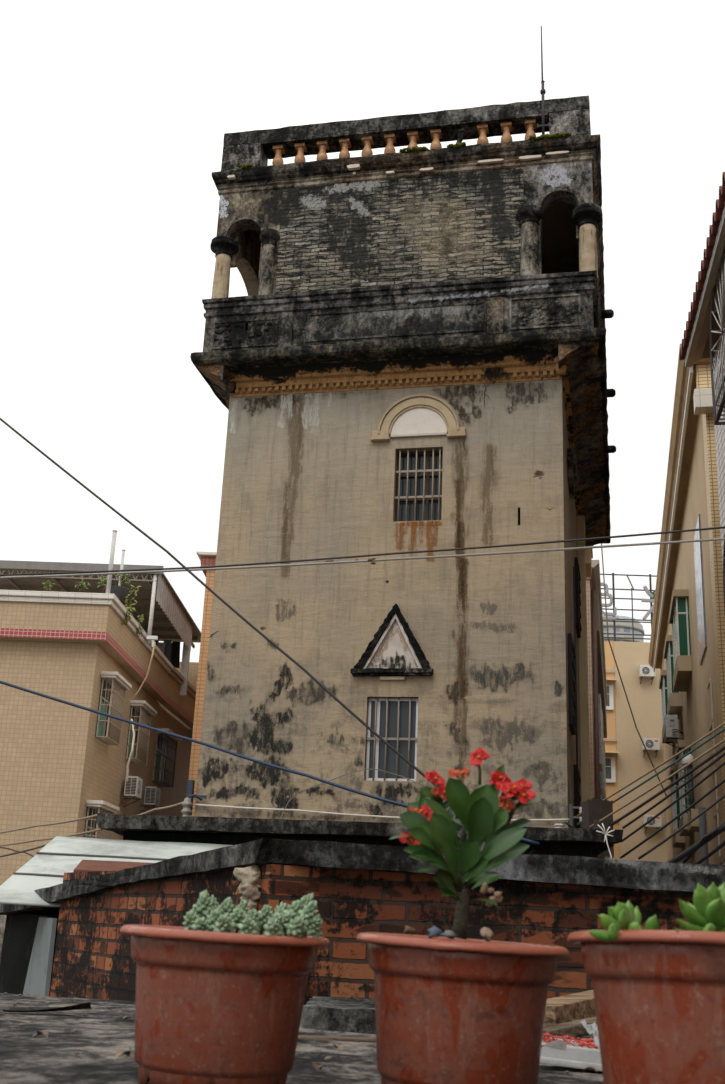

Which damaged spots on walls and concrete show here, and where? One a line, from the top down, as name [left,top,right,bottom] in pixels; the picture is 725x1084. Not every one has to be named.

water stain [218,195,229,218]
water stain [264,181,382,276]
water stain [437,204,455,255]
water stain [445,169,520,272]
water stain [540,164,572,187]
water stain [230,392,331,576]
rust [396,521,442,561]
water stain [455,445,467,610]
water stain [202,663,336,818]
water stain [445,631,533,782]